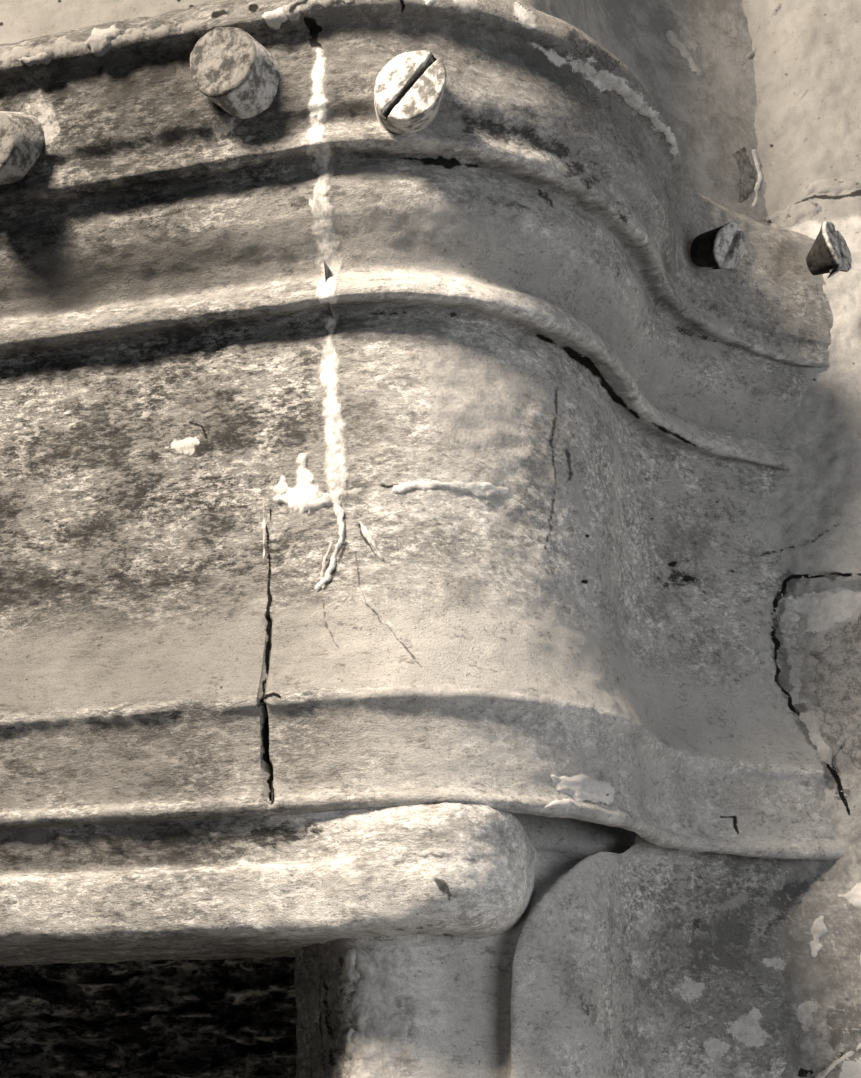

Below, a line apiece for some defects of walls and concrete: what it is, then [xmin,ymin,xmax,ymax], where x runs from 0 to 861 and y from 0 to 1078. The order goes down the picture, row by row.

crack [760,524,839,556]
crack [260,504,281,802]
crack [769,572,861,716]
flaking render [796,587,861,770]
crack [827,740,850,815]
peeling [838,882,861,910]
peeling [809,915,828,957]
peeling [762,957,786,971]
peeling [669,975,705,1003]
peeling [703,1007,771,1058]
peeling [795,999,820,1032]
flaking render [798,1038,861,1078]